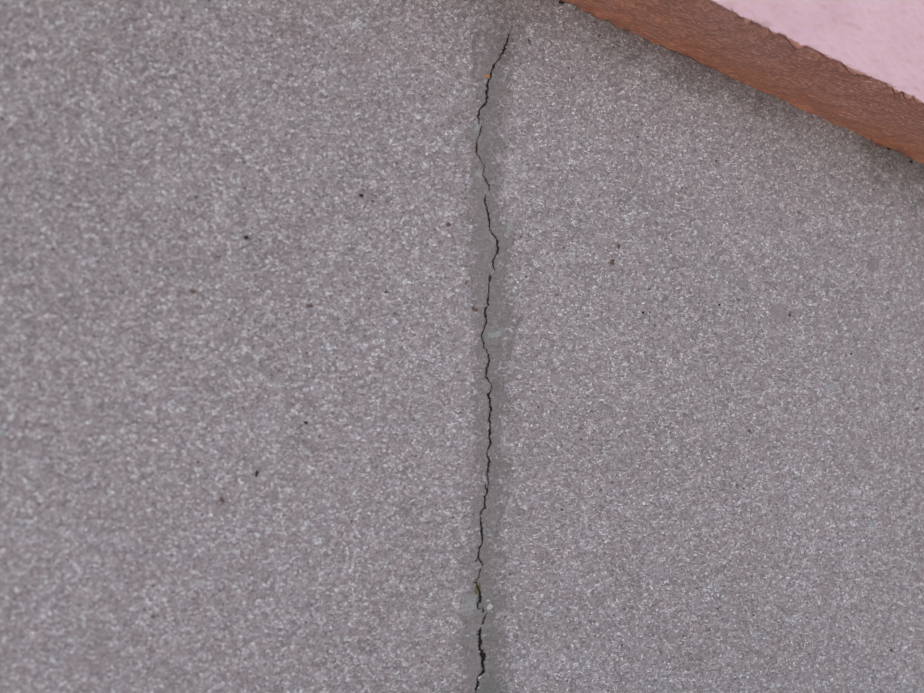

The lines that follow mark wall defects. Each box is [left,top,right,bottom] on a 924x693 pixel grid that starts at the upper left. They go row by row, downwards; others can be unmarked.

crack [474,29,511,693]